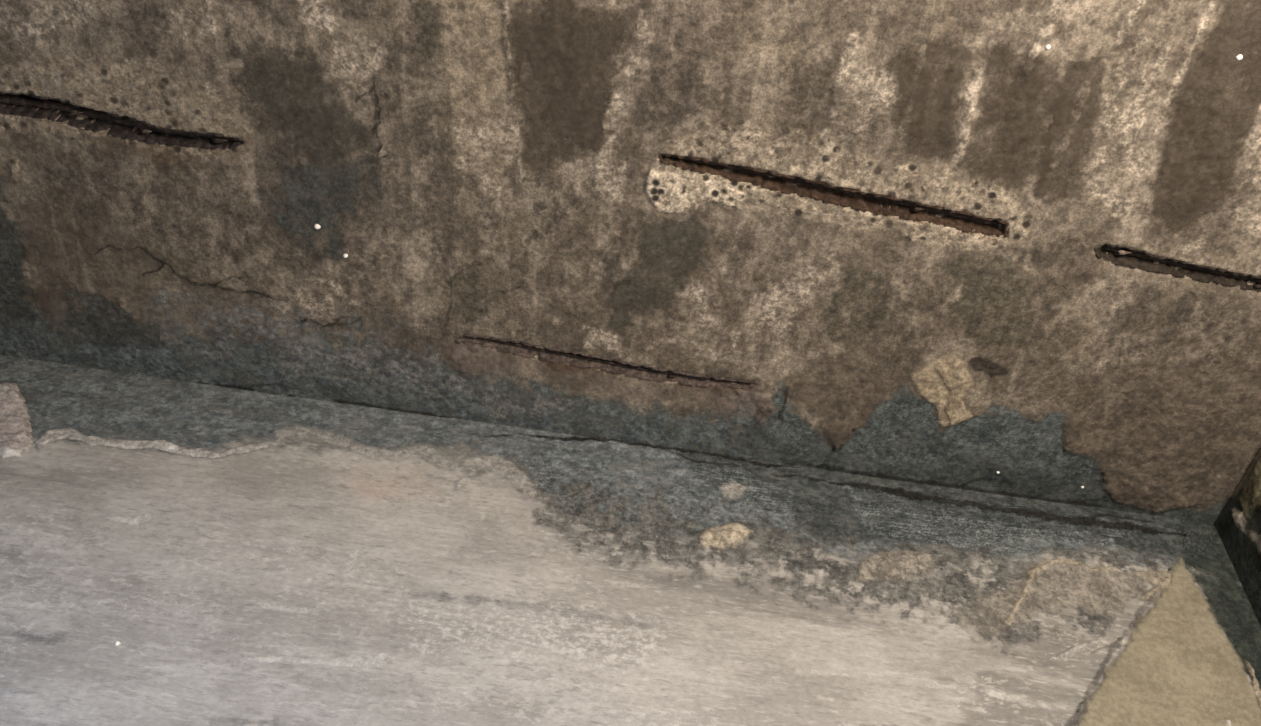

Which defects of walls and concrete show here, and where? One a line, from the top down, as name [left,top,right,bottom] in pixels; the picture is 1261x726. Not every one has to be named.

leakage [230,53,381,262]
leakage [500,0,622,172]
leakage [891,42,1103,202]
leakage [1151,0,1261,232]
crack [96,245,363,329]
flaking render [0,383,534,496]
spalling [477,337,743,383]
leakage [0,177,1261,709]
spalling [912,355,1008,427]
flaking render [700,522,751,548]
flaking render [857,550,933,581]
flaking render [960,558,1174,634]